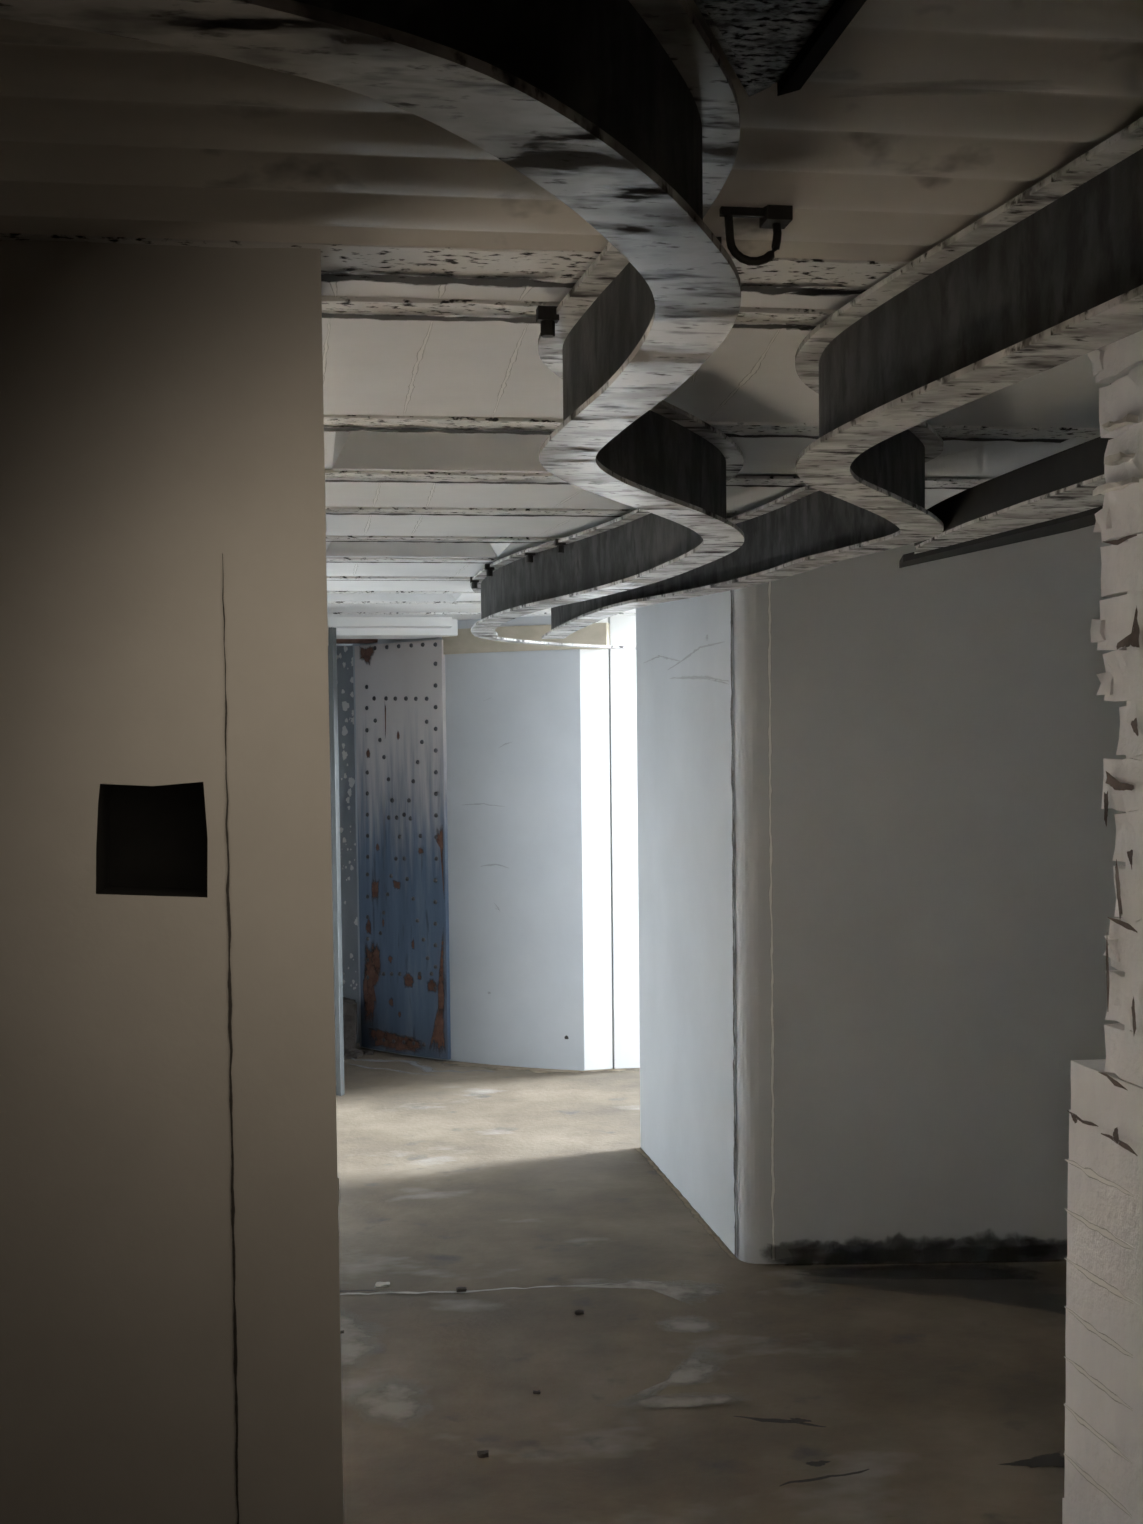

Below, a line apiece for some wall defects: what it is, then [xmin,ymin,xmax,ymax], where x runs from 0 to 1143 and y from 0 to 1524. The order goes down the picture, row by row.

crack [1103,534,1137,545]
rust [360,646,374,665]
spalling [1116,607,1140,649]
spalling [1104,771,1134,826]
rust [418,828,444,893]
spalling [1108,850,1137,933]
rust [363,919,445,1052]
crack [1099,1072,1128,1091]
crack [1065,1110,1137,1197]